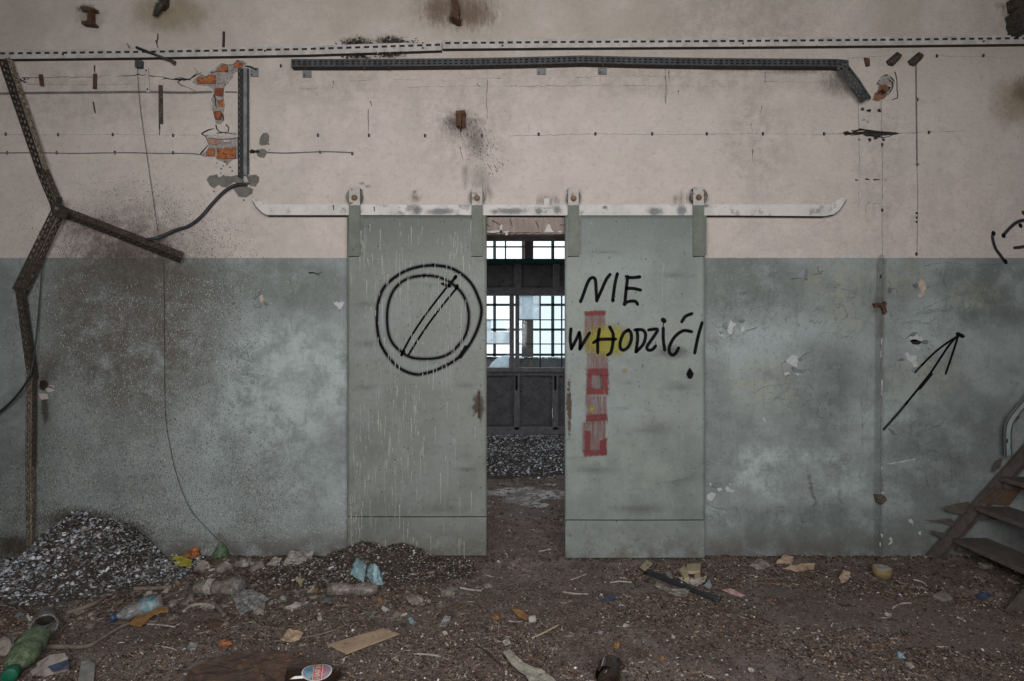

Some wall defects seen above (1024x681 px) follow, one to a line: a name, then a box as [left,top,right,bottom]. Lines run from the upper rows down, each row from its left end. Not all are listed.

spalling [872,72,898,101]
spalling [175,60,246,164]
peeling [781,351,814,380]
peeling [895,332,929,369]